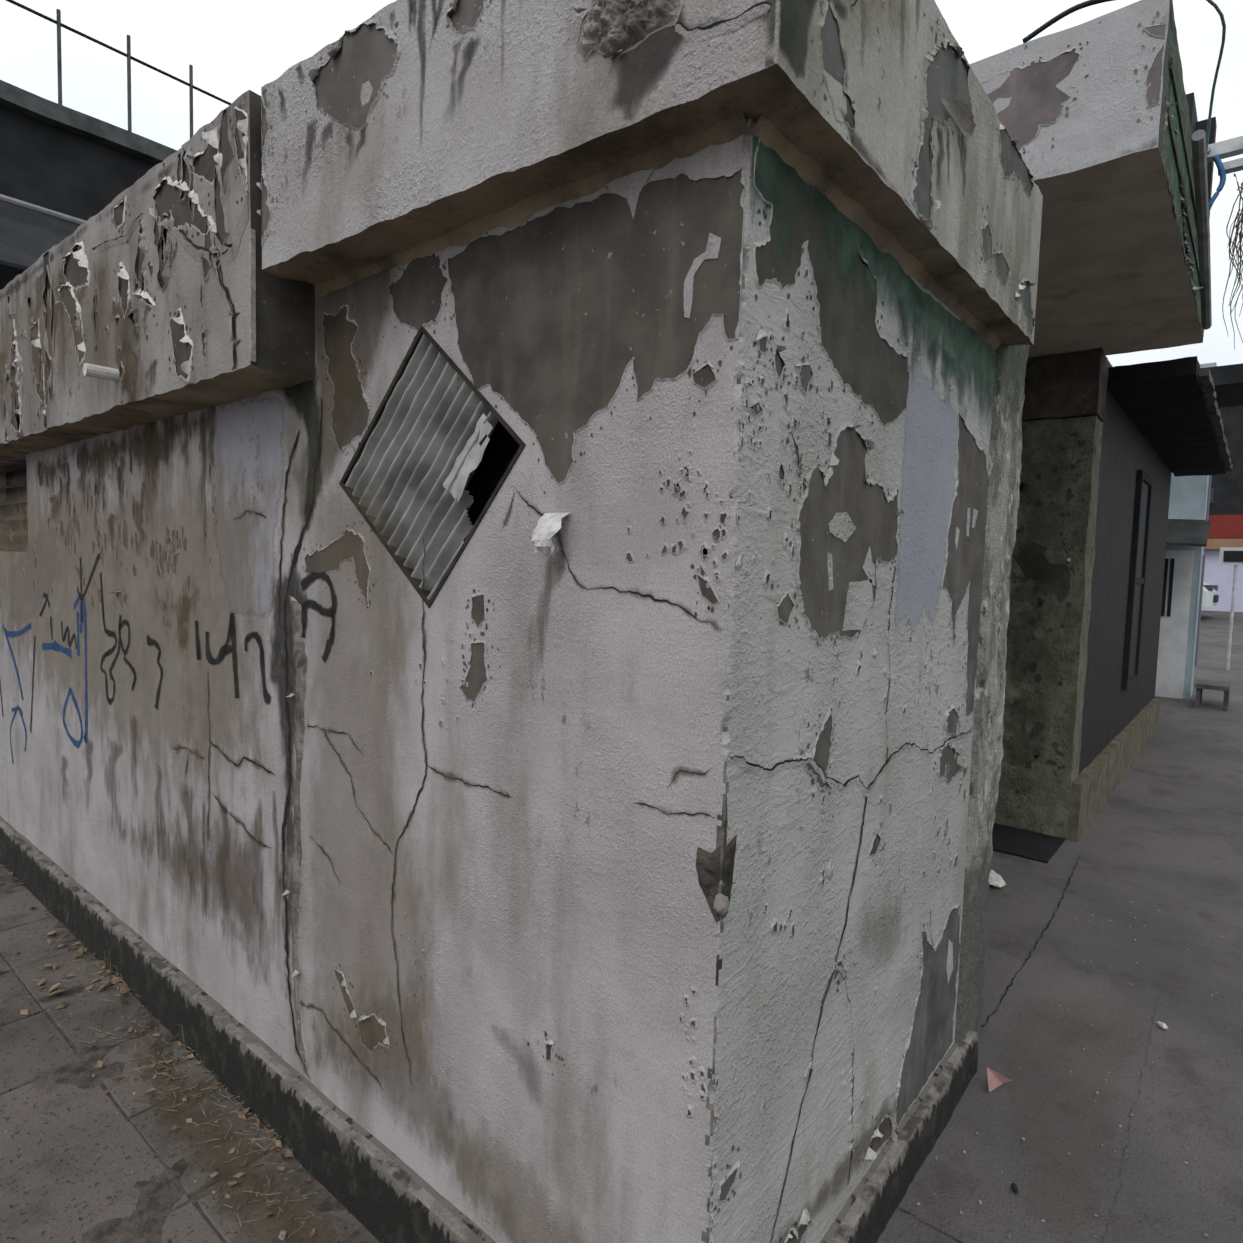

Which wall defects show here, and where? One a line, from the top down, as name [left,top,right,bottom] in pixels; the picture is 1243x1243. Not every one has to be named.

leakage [37,405,215,550]
peeling [2,88,280,441]
leakage [271,568,307,859]
crack [172,399,511,1092]
peeling [305,15,402,144]
crack [502,488,727,630]
flaking render [383,138,915,683]
leakage [844,115,886,180]
leakage [929,340,965,402]
flaking render [929,411,989,803]
peeling [909,13,1089,230]
crack [632,562,974,1242]